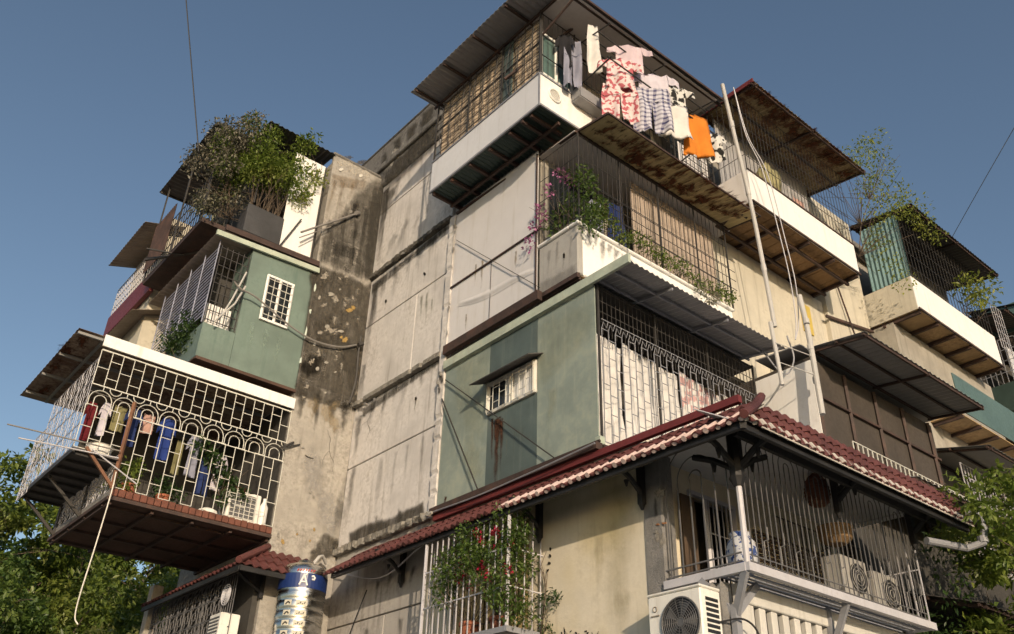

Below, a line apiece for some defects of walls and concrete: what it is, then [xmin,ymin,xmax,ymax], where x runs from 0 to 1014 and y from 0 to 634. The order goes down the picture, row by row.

corrosion [595,121,750,218]
corrosion [744,86,856,178]
leakage [295,107,449,424]
corrosion [36,337,88,395]
corrosion [491,418,503,472]